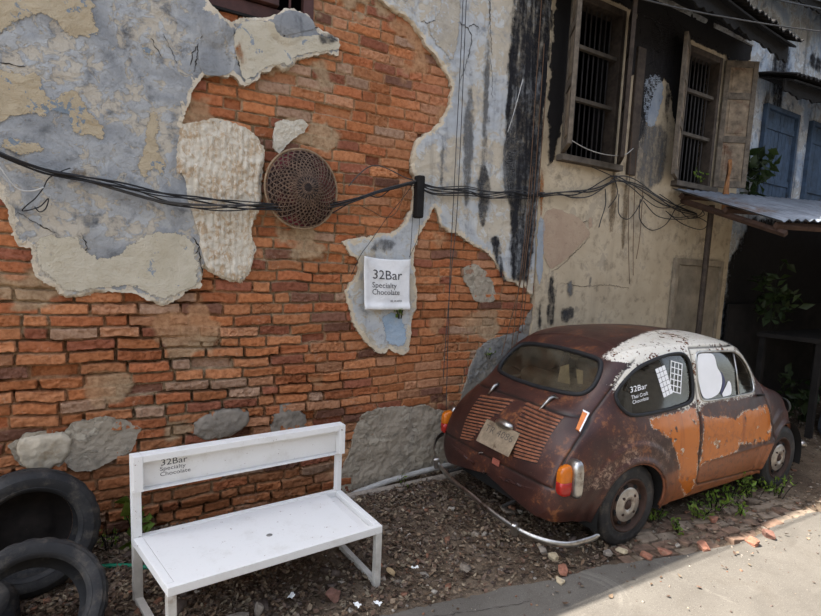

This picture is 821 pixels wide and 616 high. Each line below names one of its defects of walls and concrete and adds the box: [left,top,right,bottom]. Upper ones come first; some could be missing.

flaking render [0,0,545,536]
crack [460,1,493,94]
water stain [491,0,571,283]
water stain [610,172,628,248]
water stain [611,0,752,188]